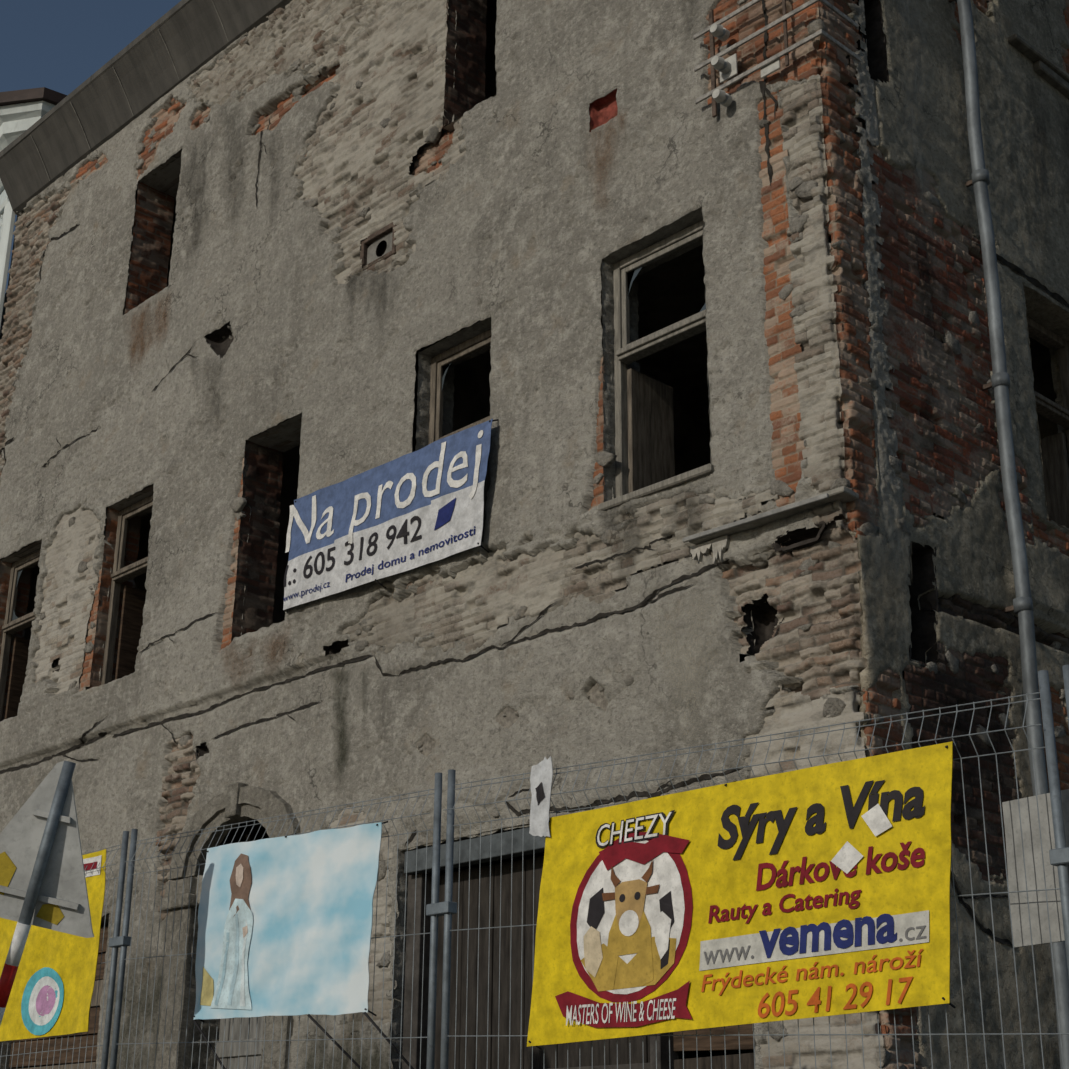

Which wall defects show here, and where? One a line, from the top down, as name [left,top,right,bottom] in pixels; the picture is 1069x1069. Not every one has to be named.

flaking render [847,0,889,83]
flaking render [135,0,466,284]
flaking render [589,88,618,132]
spalling [703,0,879,567]
crack [152,347,199,392]
spalling [328,480,794,656]
crack [572,535,672,570]
crack [0,559,730,774]
crack [505,766,743,816]
spalling [1038,681,1069,793]
spalling [341,833,397,1036]
crack [950,871,1013,946]